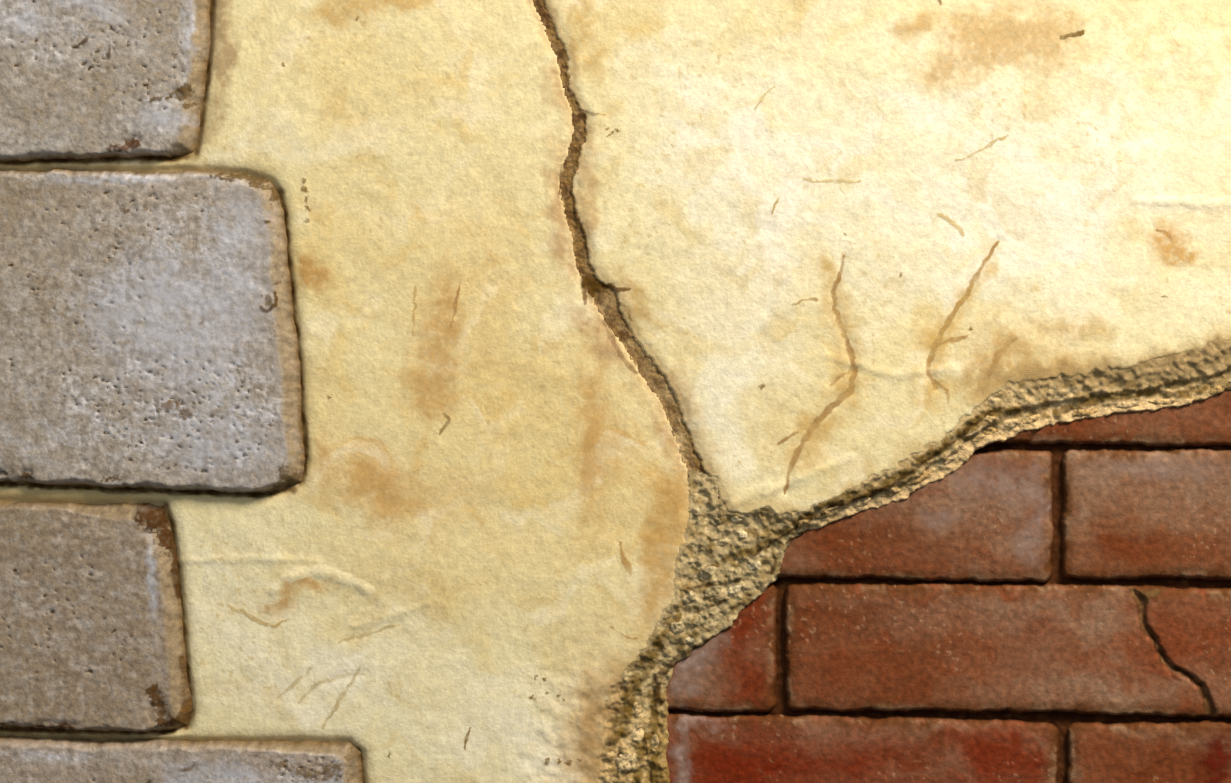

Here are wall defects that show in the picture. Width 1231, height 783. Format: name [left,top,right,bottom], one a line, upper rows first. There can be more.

crack [533,0,726,505]
crack [778,255,858,495]
crack [927,241,999,393]
flaking render [545,336,1231,783]
crack [1130,588,1216,717]